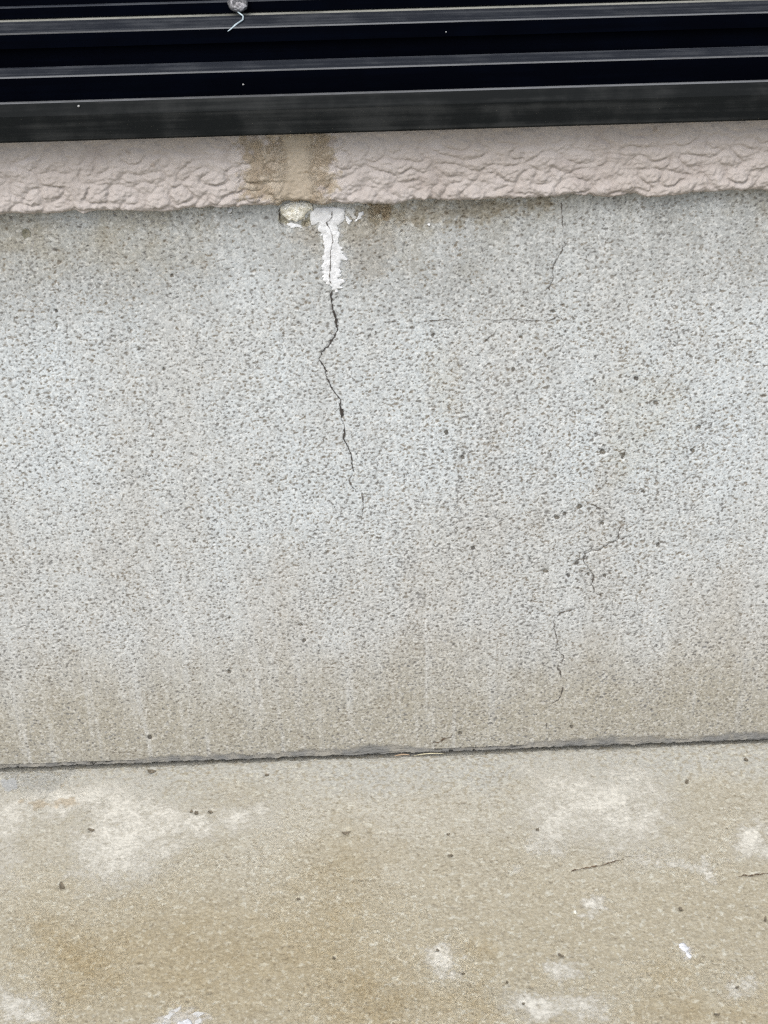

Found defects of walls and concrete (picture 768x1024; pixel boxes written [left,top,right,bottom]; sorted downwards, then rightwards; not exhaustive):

damp [279,134,364,293]
crack [319,290,364,514]
crack [546,500,631,733]